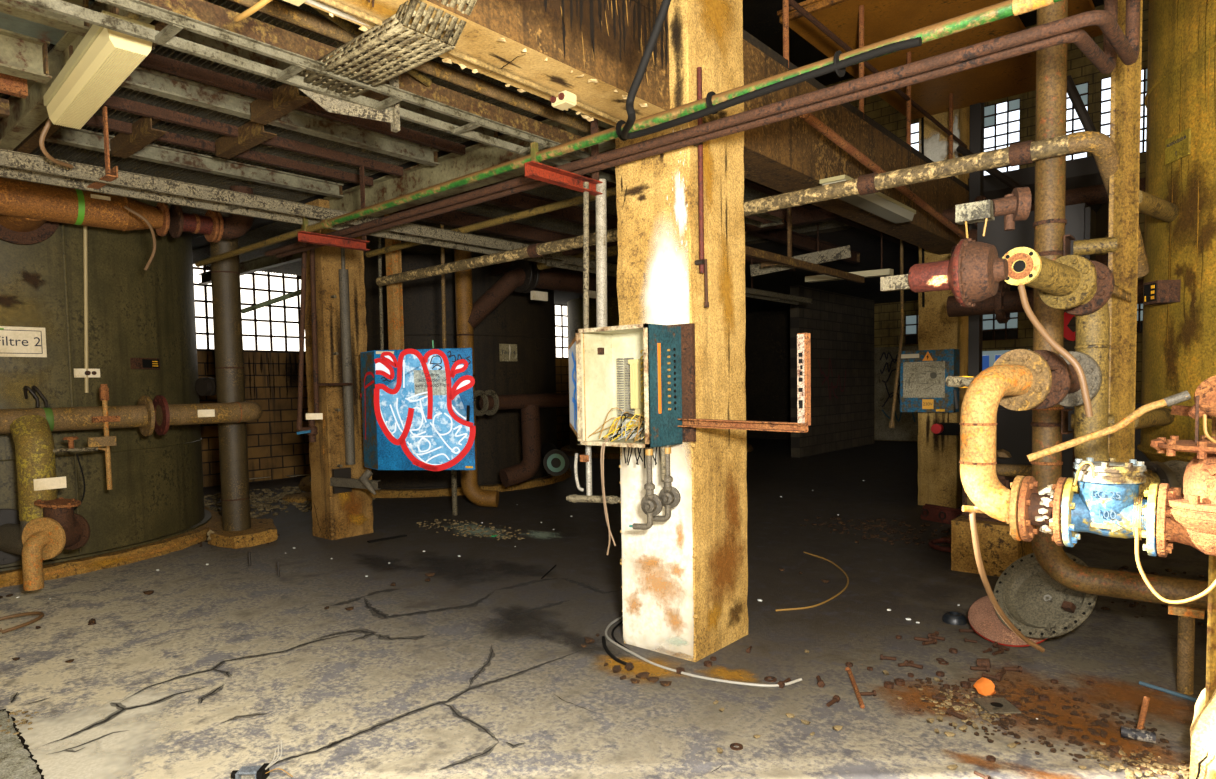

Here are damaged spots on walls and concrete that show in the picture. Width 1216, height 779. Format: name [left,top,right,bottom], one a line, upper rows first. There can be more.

water stain [621,177,648,201]
water stain [646,159,690,325]
rust [630,558,683,611]
water stain [620,445,694,658]
rust [667,612,682,629]
rust [709,477,742,627]
crack [48,578,612,770]
rust [946,751,1000,769]
rust [890,672,1194,763]
rust [1020,767,1074,779]